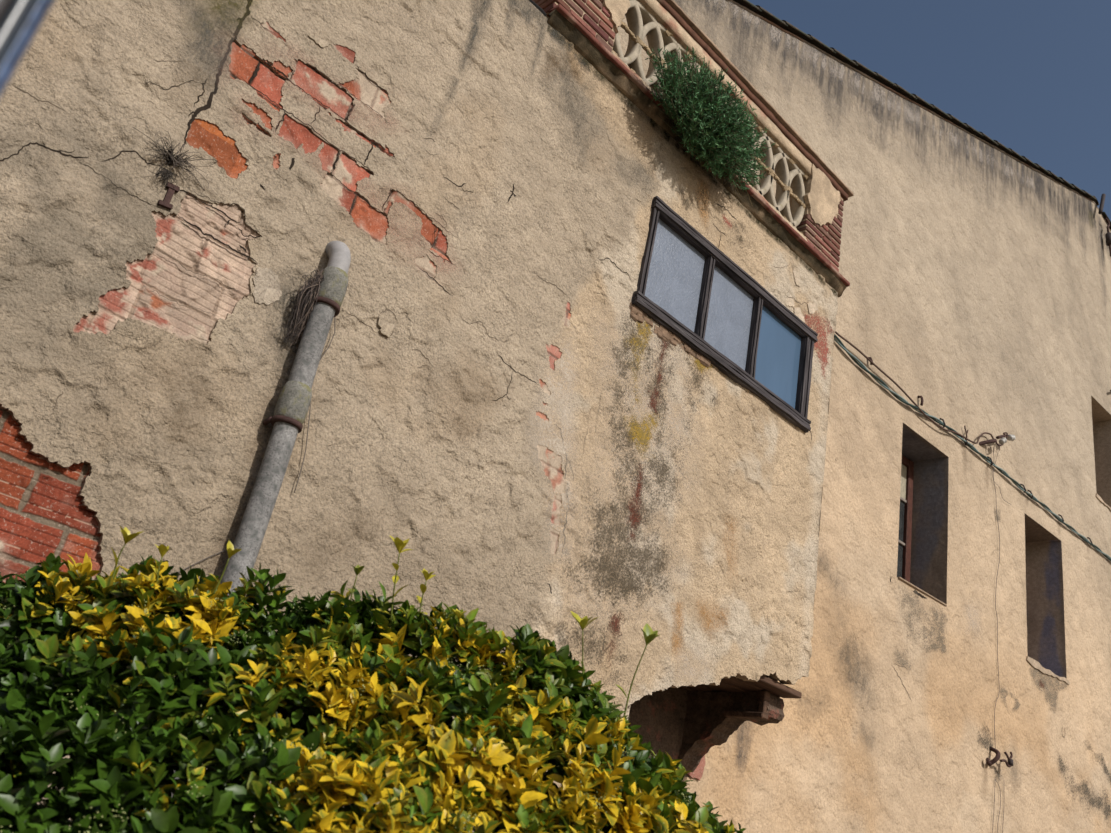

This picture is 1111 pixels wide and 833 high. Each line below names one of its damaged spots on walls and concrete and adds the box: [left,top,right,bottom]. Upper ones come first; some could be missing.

peeling [0,404,104,583]